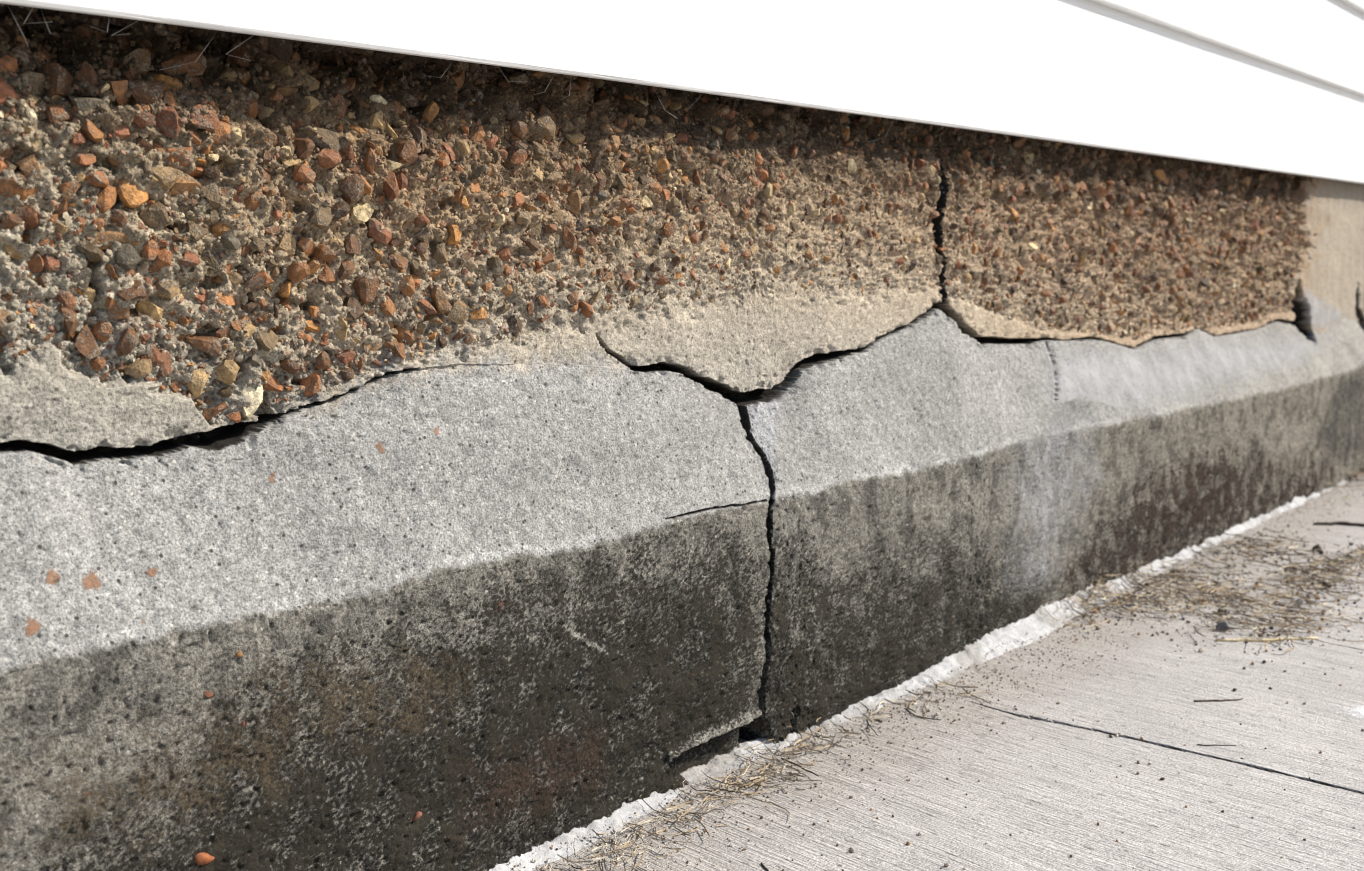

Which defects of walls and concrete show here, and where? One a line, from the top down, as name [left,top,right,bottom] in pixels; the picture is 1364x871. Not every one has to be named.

spalling [0,3,1314,427]
crack [0,367,420,464]
leakage [1017,428,1099,582]